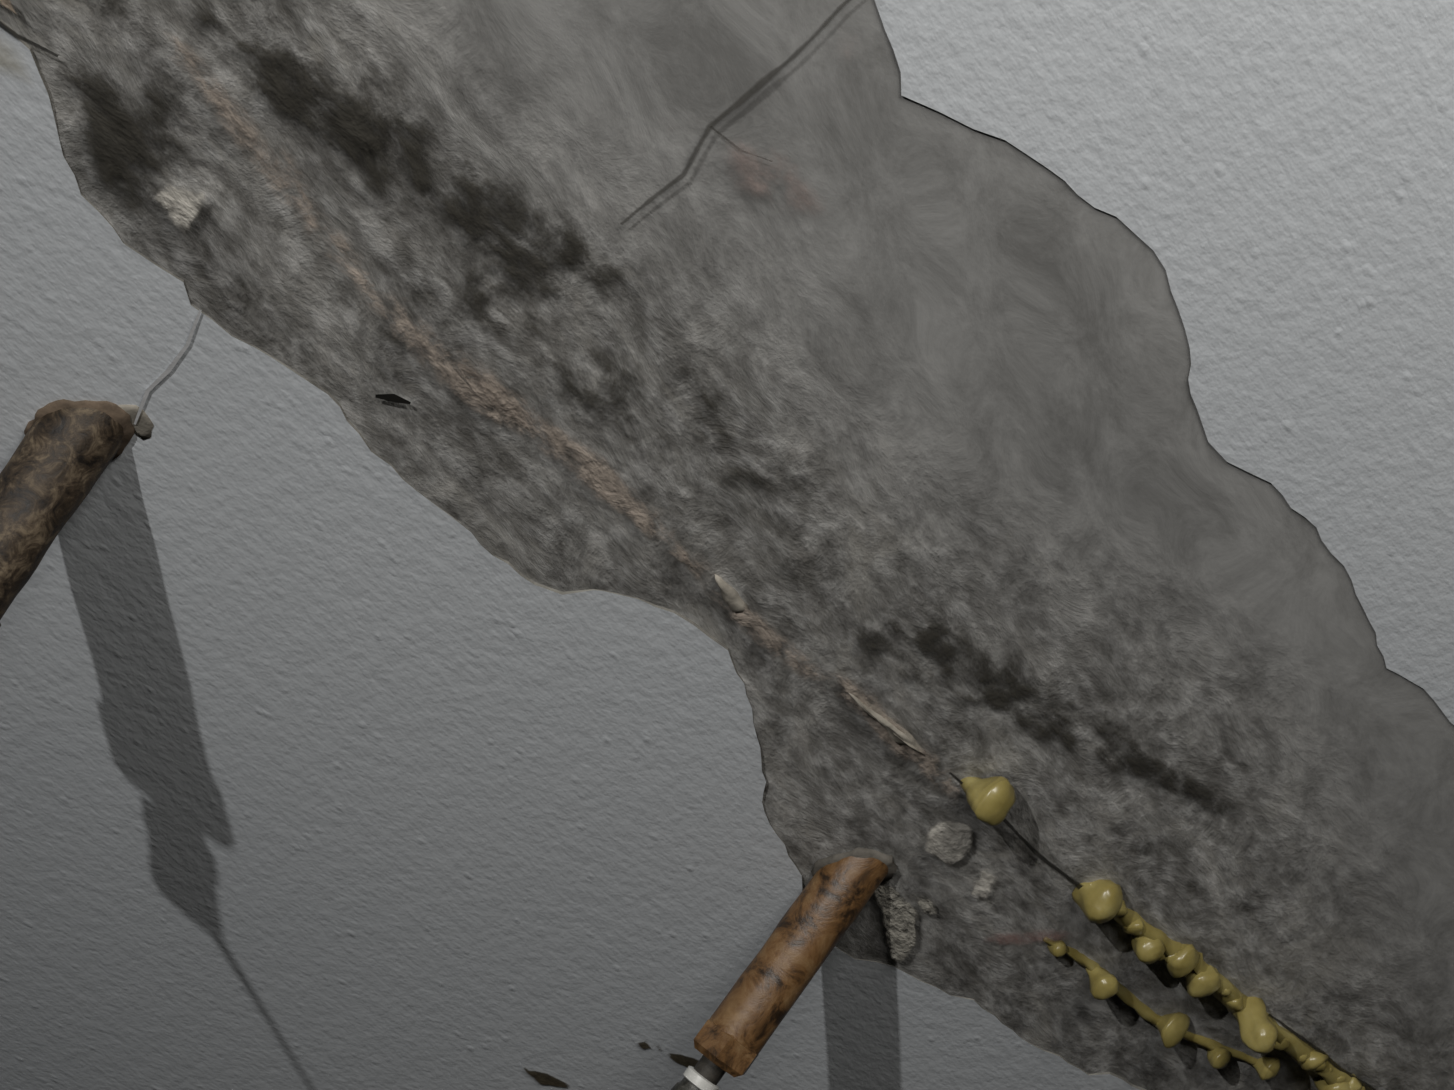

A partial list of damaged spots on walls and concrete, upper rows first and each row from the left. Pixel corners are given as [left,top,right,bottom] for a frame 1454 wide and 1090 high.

peeling [118,405,154,440]
crack [1003,819,1083,889]
crack [1268,1014,1376,1090]